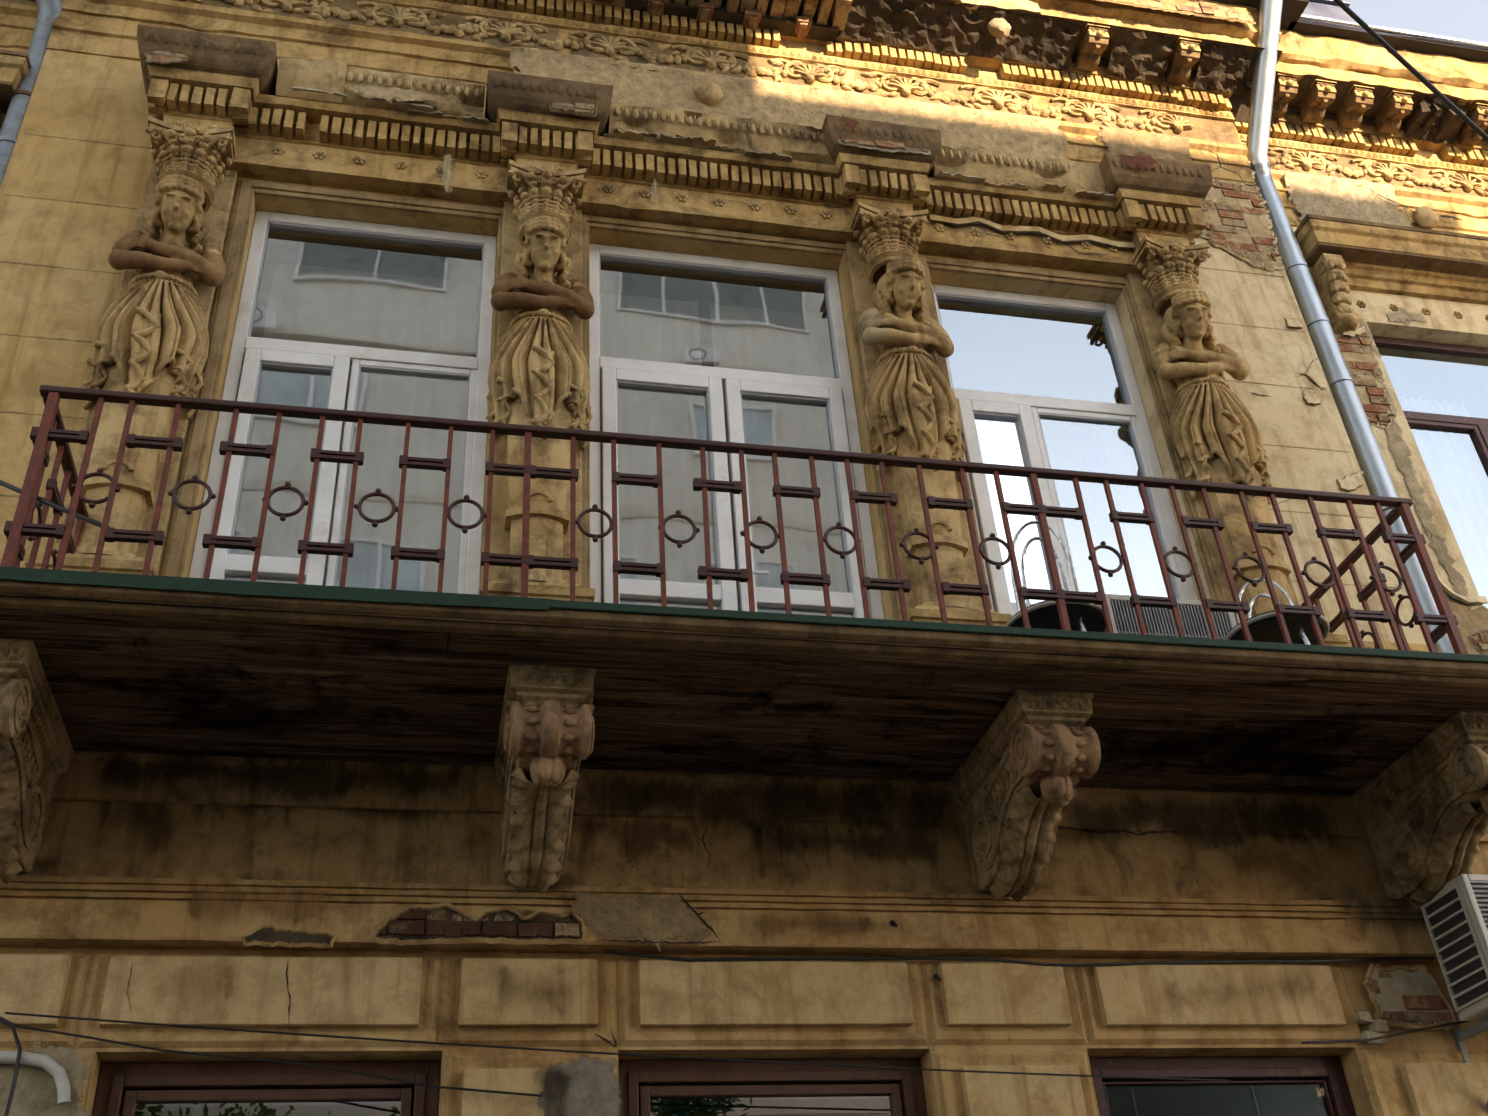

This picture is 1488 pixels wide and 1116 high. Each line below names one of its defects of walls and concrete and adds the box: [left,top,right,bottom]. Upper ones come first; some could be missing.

peeling [1098,125,1195,163]
flaking render [1200,160,1284,271]
flaking render [1336,318,1488,655]
water stain [1099,712,1386,779]
water stain [104,755,459,837]
water stain [586,743,951,858]
water stain [1074,797,1332,879]
flaking render [241,924,337,948]
flaking render [371,891,717,950]
spalling [1353,963,1456,1047]